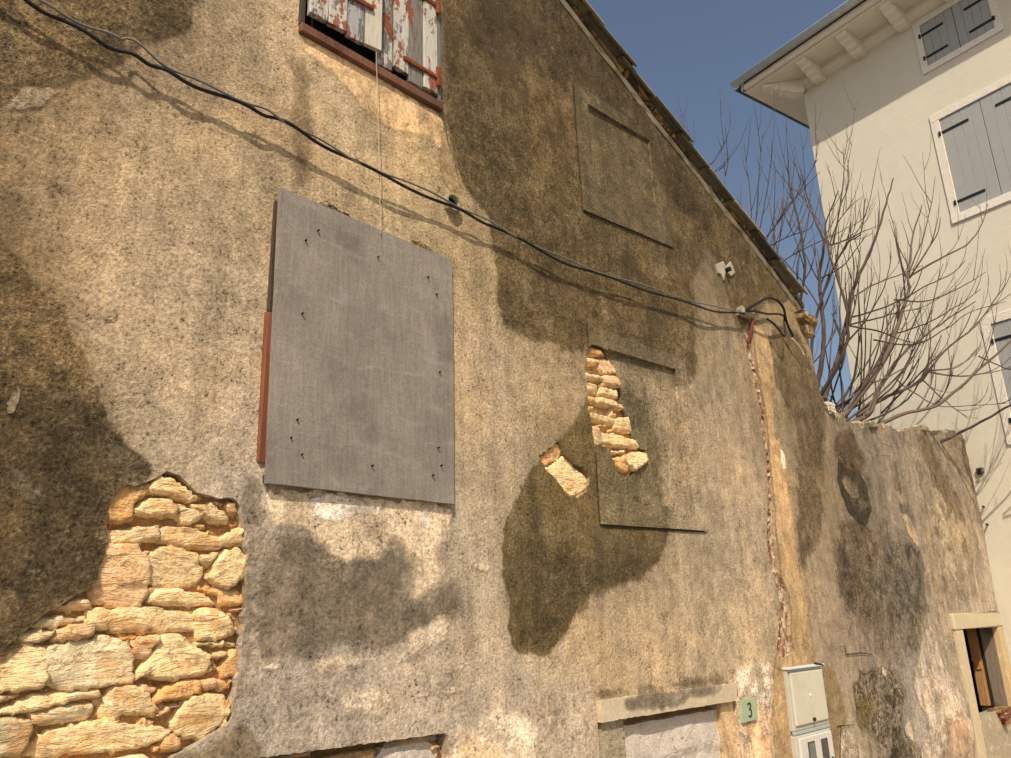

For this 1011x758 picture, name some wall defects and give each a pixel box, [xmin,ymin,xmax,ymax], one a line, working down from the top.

damp [0,0,198,101]
damp [301,0,792,380]
damp [0,240,152,653]
flaking render [0,474,246,758]
damp [237,475,458,697]
peeling [429,704,548,758]
flaking render [539,443,587,496]
damp [502,396,667,656]
flaking render [585,348,649,477]
crack [744,324,790,658]
damp [853,668,922,758]
damp [837,429,979,651]